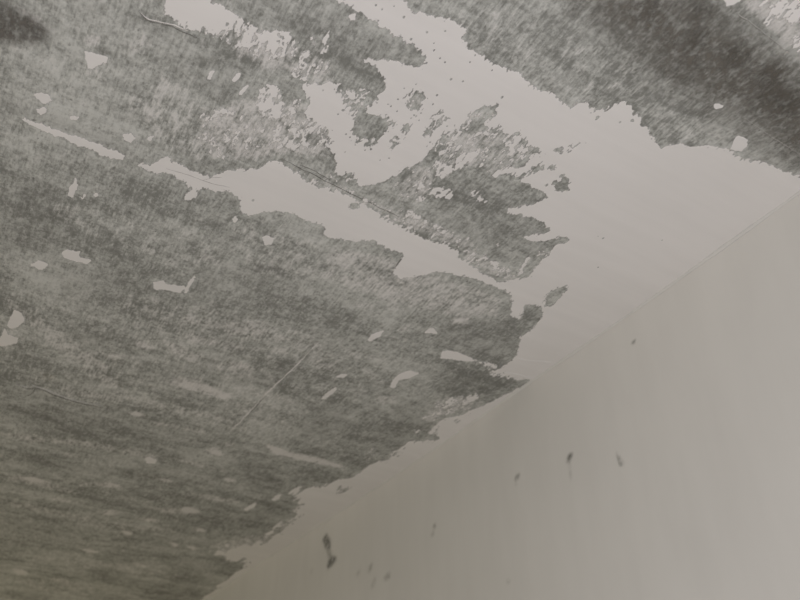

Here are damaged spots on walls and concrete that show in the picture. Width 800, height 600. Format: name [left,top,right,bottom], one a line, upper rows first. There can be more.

leakage [0,8,44,42]
leakage [604,0,800,150]